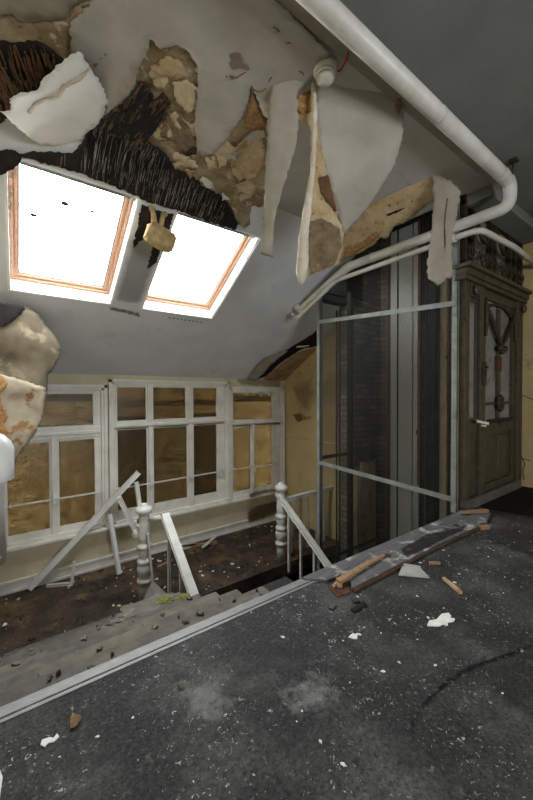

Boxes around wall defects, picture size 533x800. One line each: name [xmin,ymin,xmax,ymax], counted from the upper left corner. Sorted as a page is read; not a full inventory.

flaking render [0,0,92,58]
flaking render [125,39,268,228]